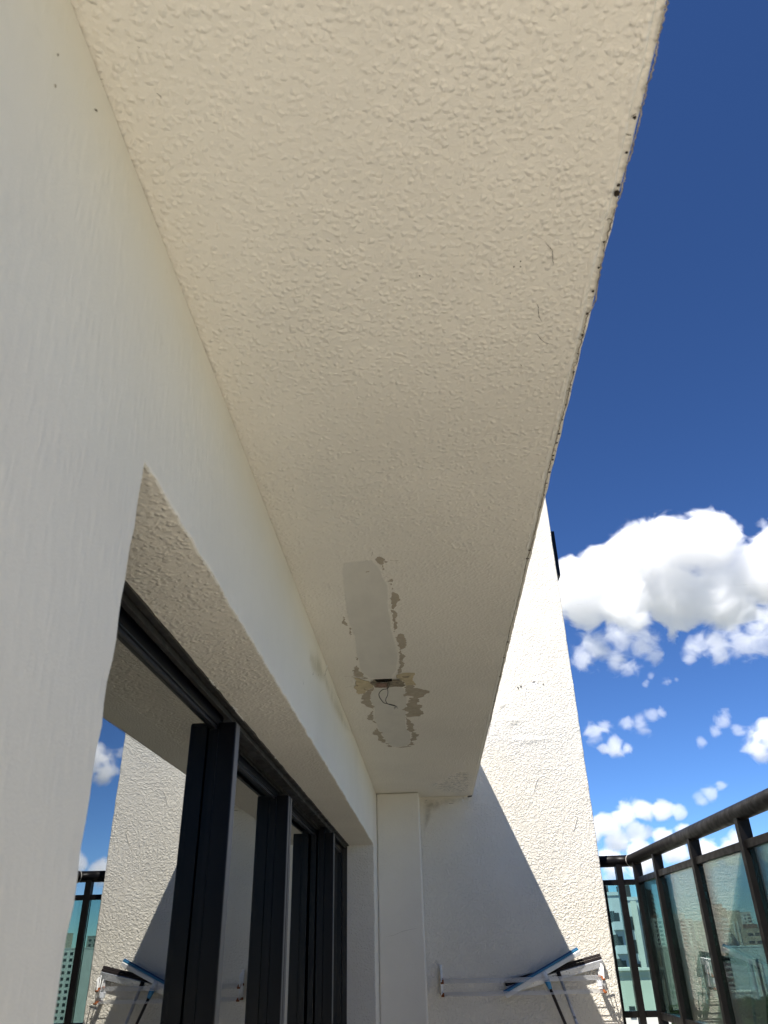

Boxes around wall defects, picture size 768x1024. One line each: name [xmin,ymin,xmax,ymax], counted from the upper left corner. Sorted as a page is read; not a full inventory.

peeling [339,557,430,748]